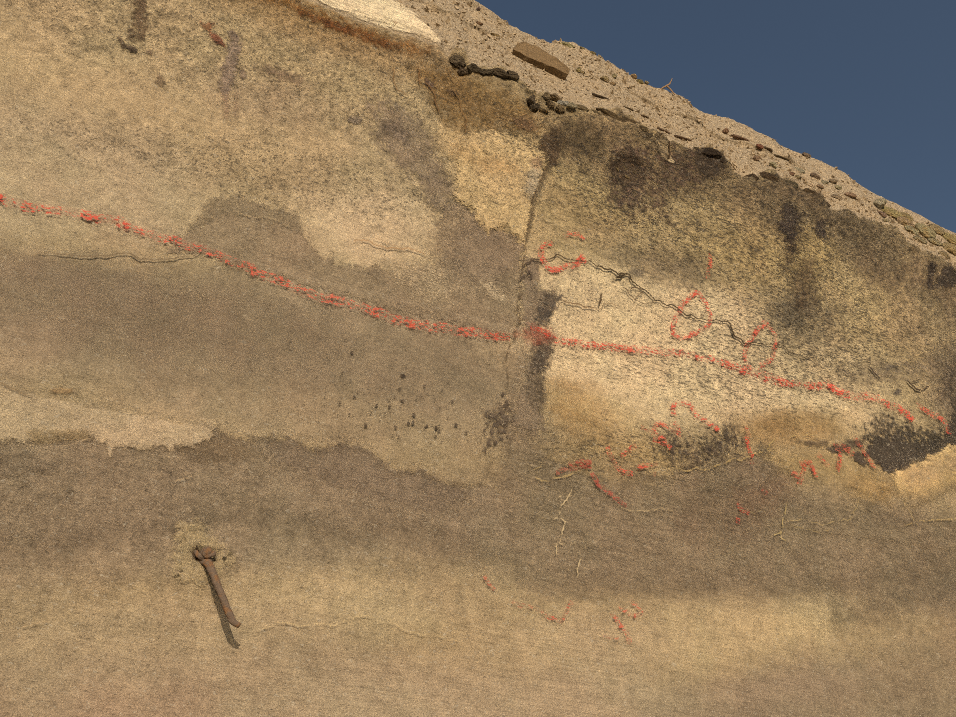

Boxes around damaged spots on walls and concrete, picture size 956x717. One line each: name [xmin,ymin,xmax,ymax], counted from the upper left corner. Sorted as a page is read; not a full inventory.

damp [118,0,153,54]
damp [218,30,303,118]
damp [0,96,956,588]
crack [506,152,822,383]